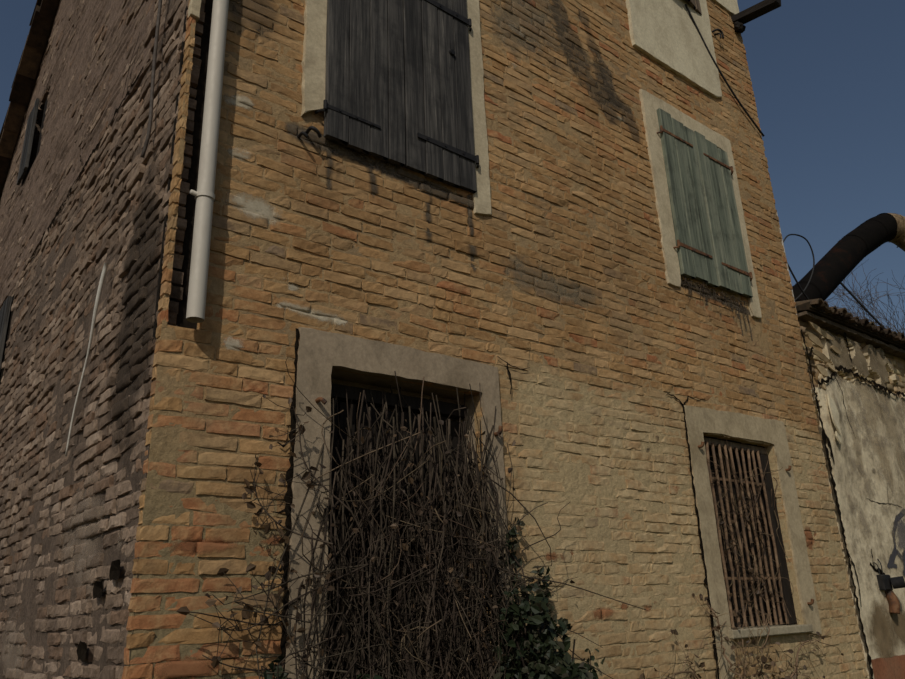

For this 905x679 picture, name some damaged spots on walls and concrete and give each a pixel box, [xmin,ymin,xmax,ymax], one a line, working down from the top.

damp [286,123,476,271]
spalling [806,321,905,444]